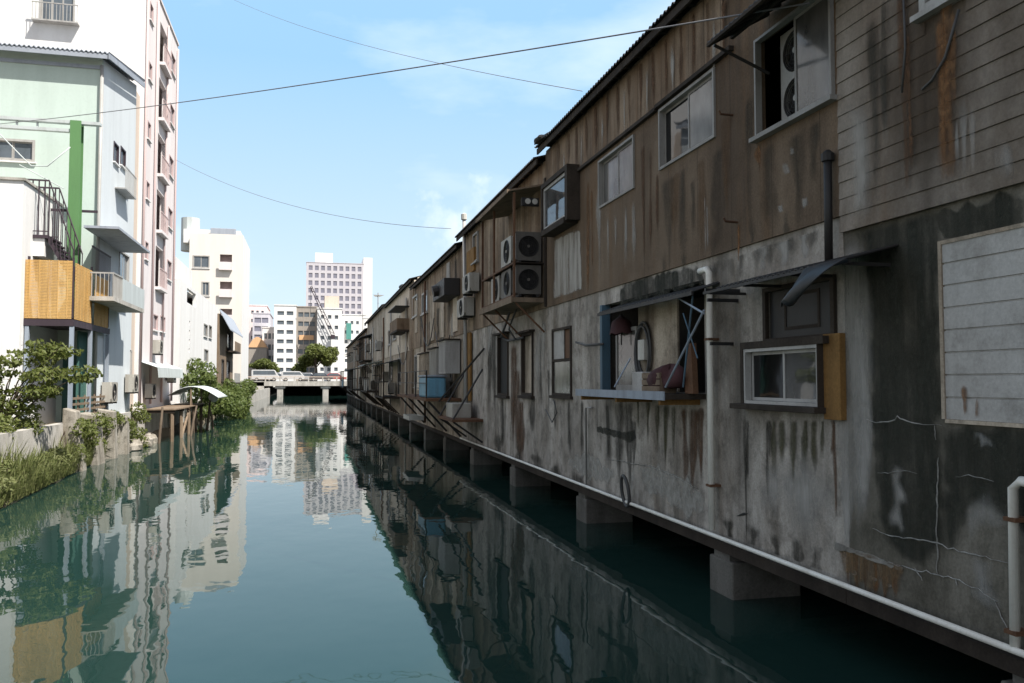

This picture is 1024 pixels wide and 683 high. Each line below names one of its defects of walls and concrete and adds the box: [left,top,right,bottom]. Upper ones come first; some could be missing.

leakage [855,5,886,200]
corrosion [936,6,955,163]
corrosion [682,409,704,479]
leakage [744,430,755,544]
leakage [766,421,824,519]
leakage [838,191,1024,561]
crack [867,416,1008,628]